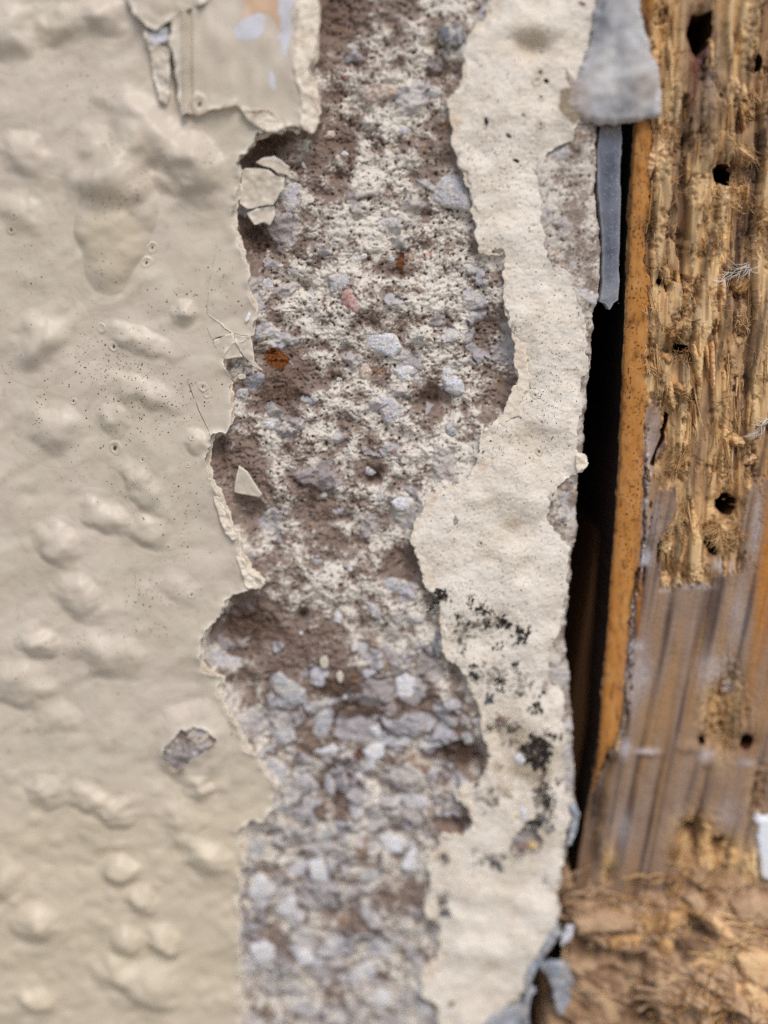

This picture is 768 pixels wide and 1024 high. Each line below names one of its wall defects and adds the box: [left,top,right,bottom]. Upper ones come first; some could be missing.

crack [207,251,244,340]
spalling [128,0,518,1024]
water stain [426,588,563,873]
mould [428,853,457,926]